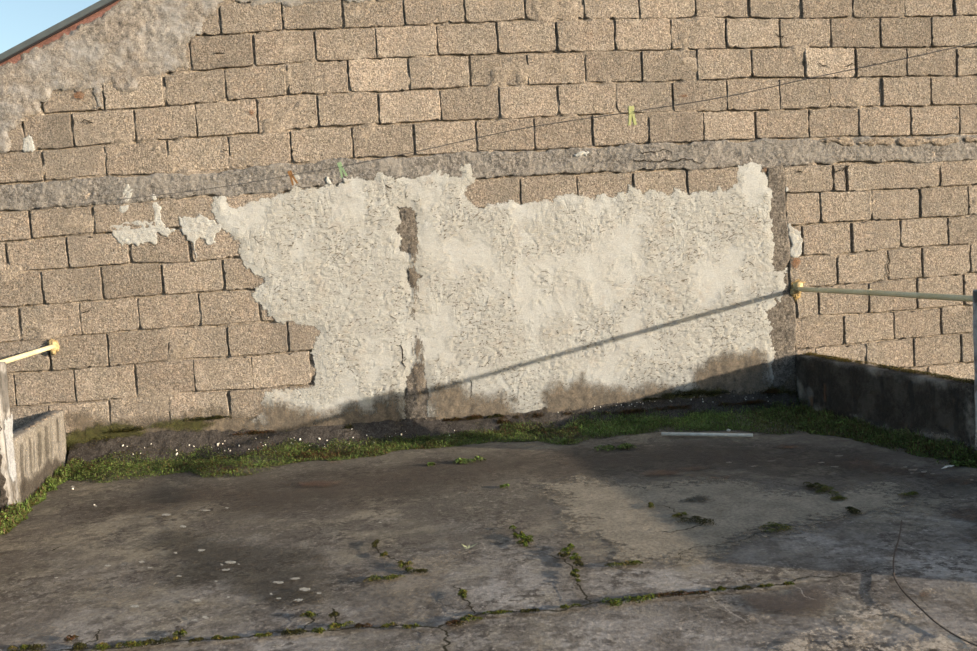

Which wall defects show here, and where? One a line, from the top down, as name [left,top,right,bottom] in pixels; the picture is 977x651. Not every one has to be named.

peeling [22,135,35,152]
flaking render [395,207,429,421]
water stain [429,382,519,420]
water stain [542,373,674,412]
water stain [688,350,772,398]
water stain [786,358,969,446]
water stain [21,459,64,503]
crack [653,480,856,564]
crack [57,529,900,651]